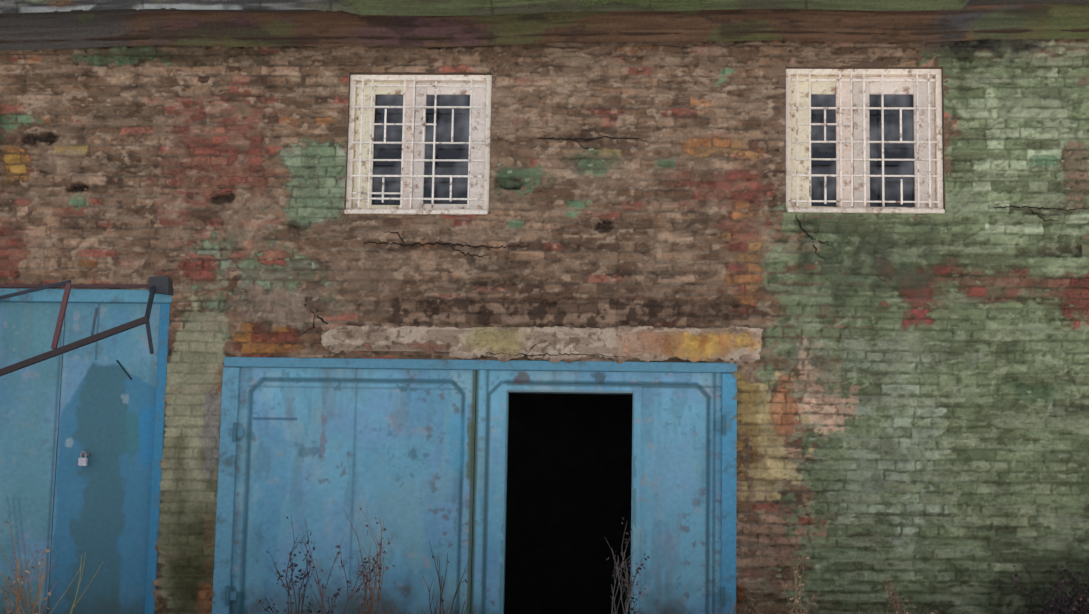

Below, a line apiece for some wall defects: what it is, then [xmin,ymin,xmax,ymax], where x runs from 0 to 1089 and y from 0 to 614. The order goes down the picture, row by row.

crack [538,136,644,150]
crack [994,205,1089,221]
crack [364,231,529,257]
peeling [900,259,1089,329]
spalling [386,340,447,353]